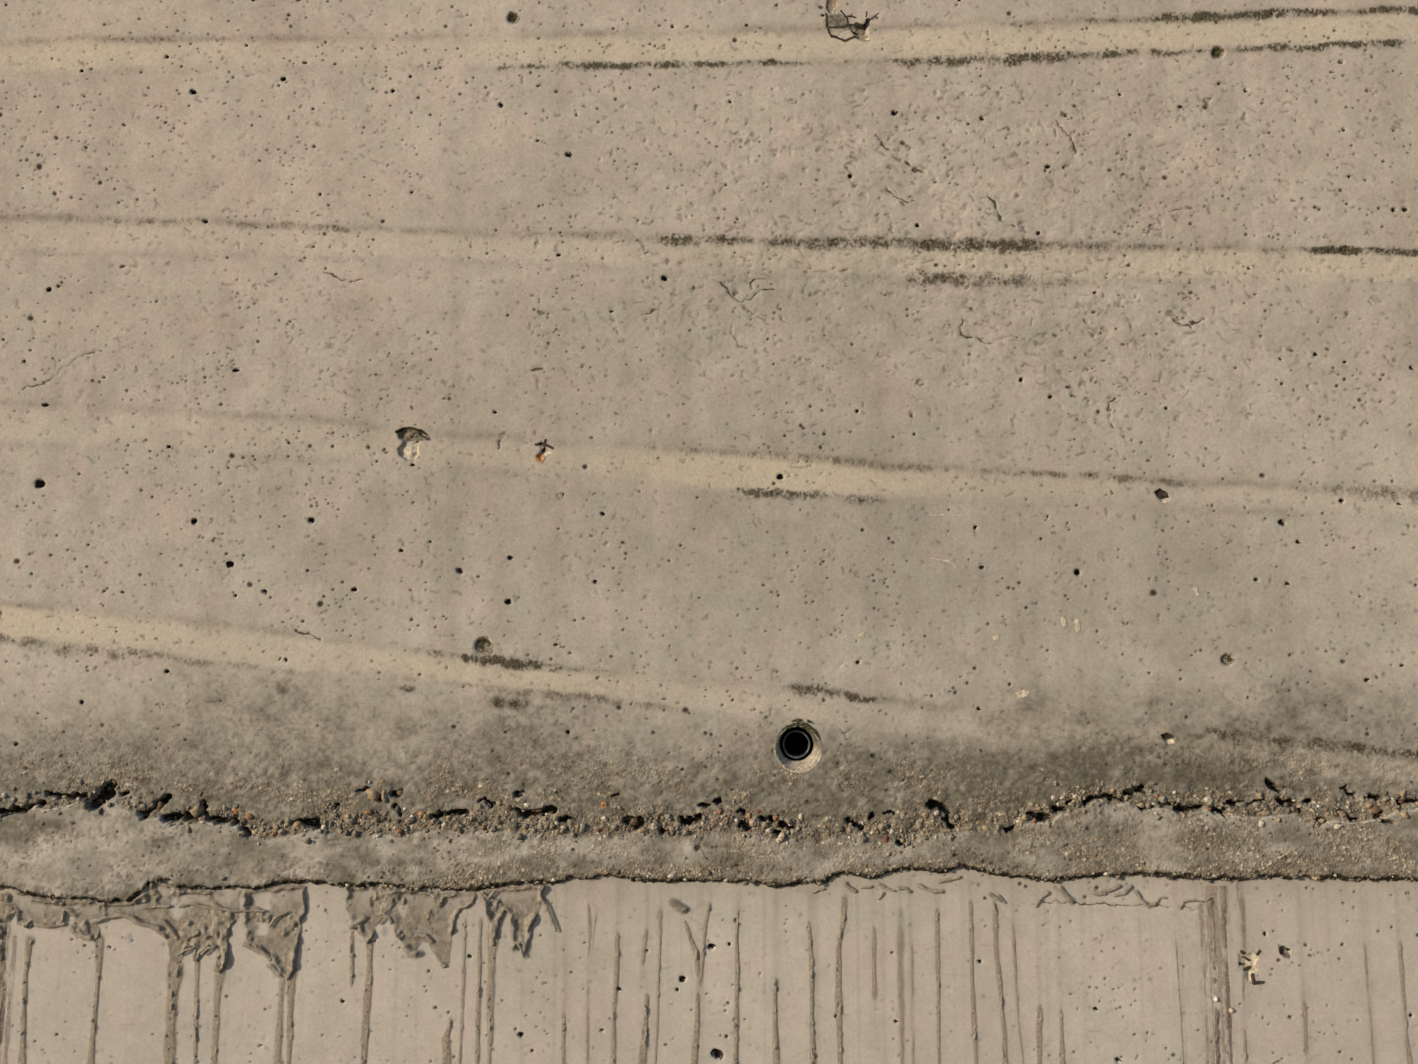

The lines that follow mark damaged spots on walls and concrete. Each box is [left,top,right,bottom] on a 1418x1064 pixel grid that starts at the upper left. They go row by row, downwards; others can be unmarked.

spalling [825,0,879,42]